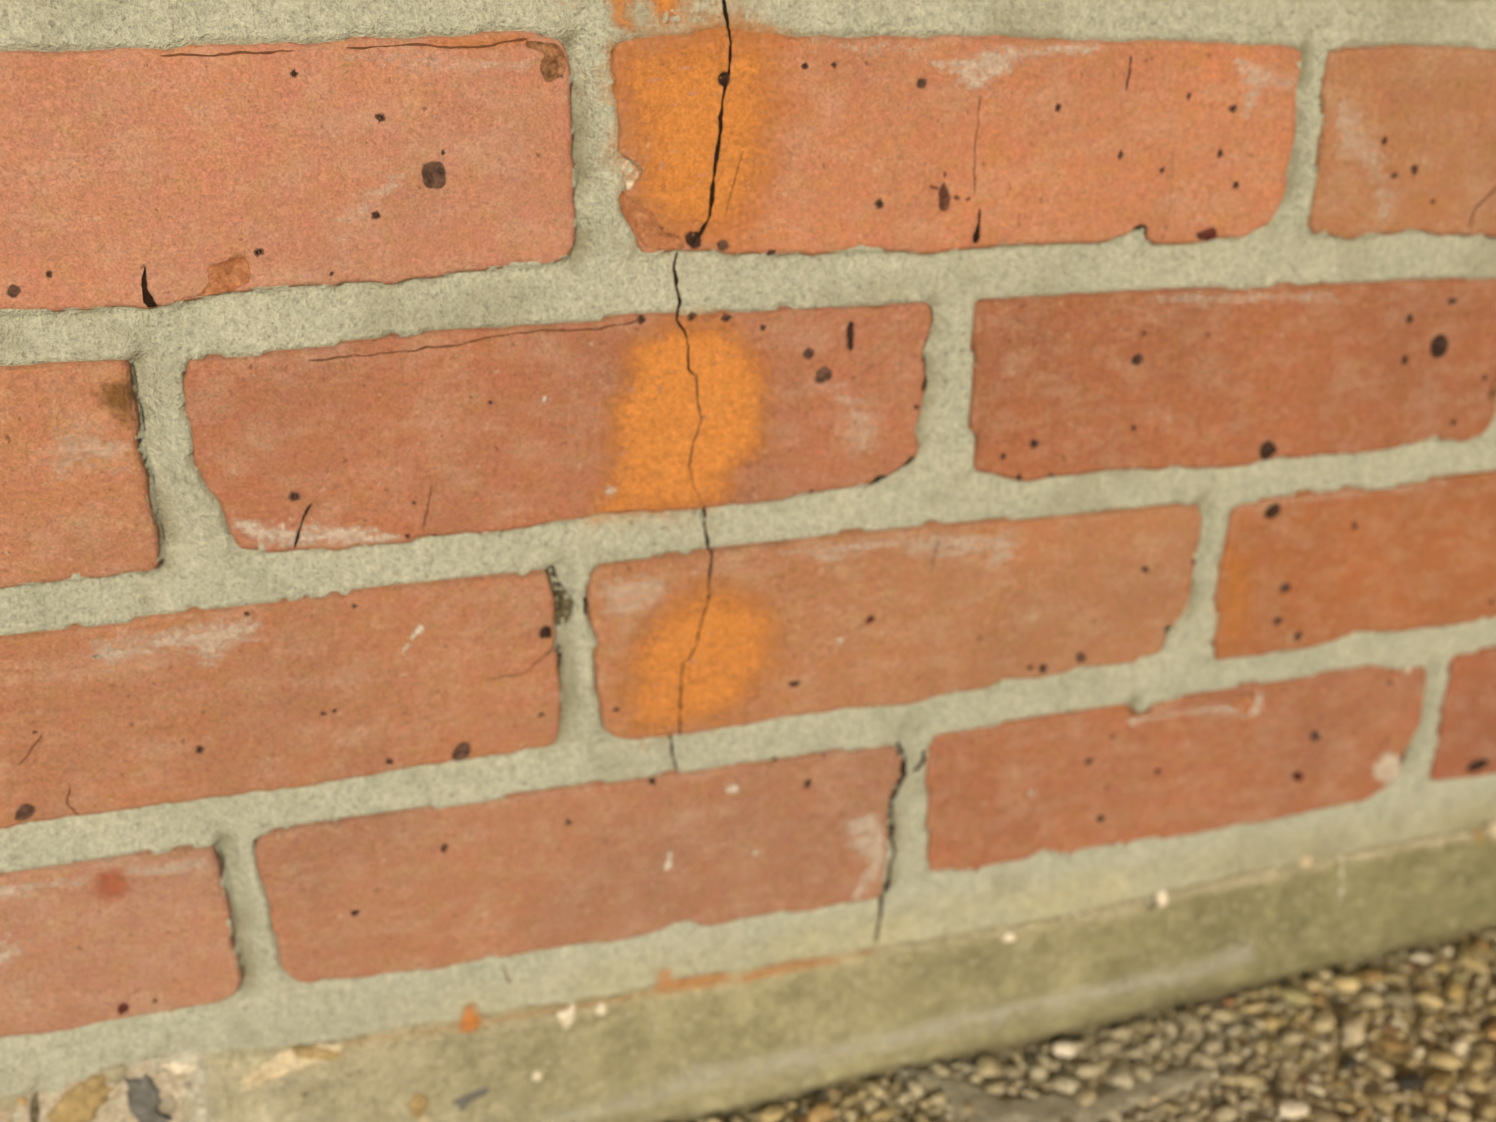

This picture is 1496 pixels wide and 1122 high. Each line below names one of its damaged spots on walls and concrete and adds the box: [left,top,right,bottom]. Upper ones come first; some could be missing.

crack [160,49,293,57]
crack [346,38,527,49]
crack [308,320,640,361]
crack [669,0,742,771]
rust [597,325,767,515]
crack [422,487,432,528]
crack [488,645,554,680]
rust [630,590,776,727]
crack [875,742,926,943]
spalling [0,1057,196,1122]